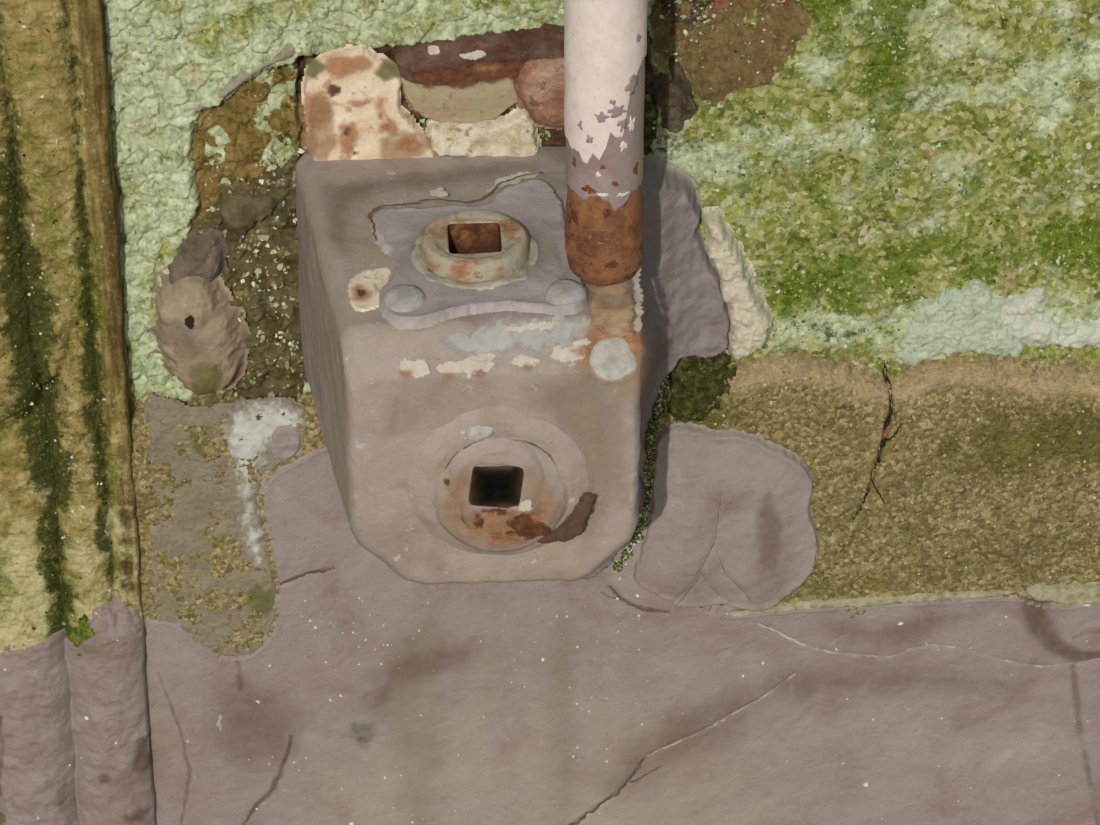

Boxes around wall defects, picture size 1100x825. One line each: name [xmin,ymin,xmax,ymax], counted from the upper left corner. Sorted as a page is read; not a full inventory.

rust [413,45,530,88]
rust [645,16,655,75]
rust [295,44,400,158]
rust [352,89,429,159]
rust [538,127,566,146]
peeling [348,266,391,312]
peeling [144,43,314,656]
peeling [398,313,595,379]
crack [852,364,902,522]
rust [473,499,552,545]
crack [757,623,890,657]
crack [569,674,795,825]